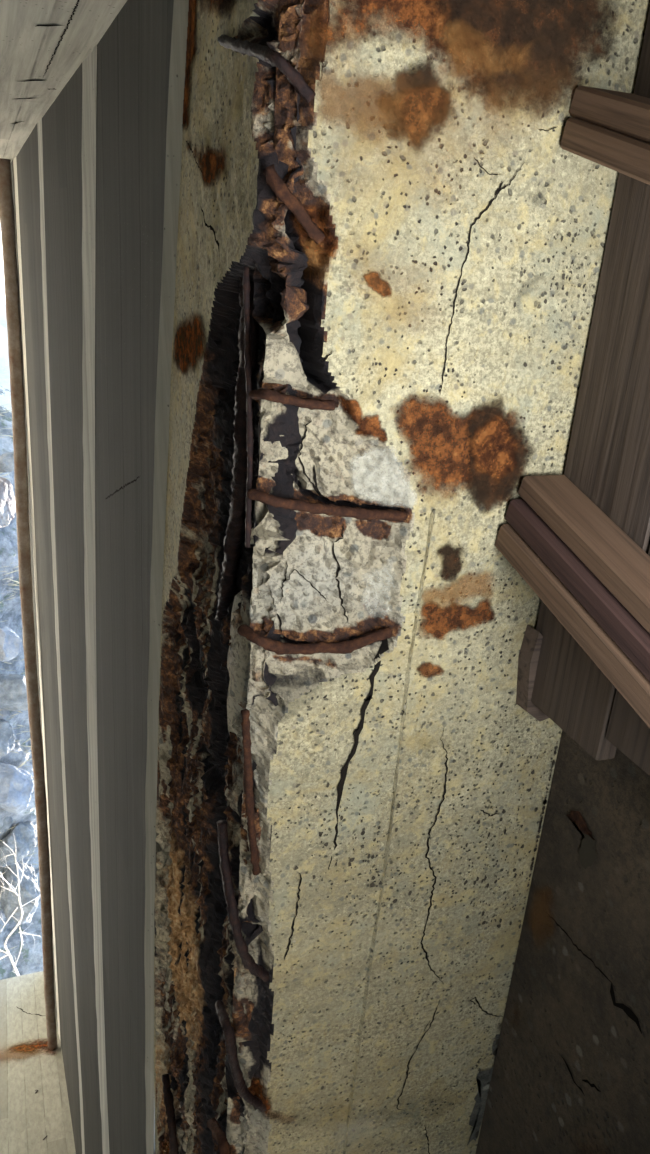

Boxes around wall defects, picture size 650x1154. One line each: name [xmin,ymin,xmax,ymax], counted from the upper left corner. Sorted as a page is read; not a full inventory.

corrosion [182,0,234,186]
corrosion [308,0,618,150]
corrosion [173,314,208,375]
corrosion [364,272,392,297]
crack [440,157,525,395]
corrosion [338,395,534,513]
spalling [154,0,415,1154]
corrosion [420,545,495,639]
crack [284,639,389,959]
crack [397,729,448,1110]
crack [468,997,503,1017]